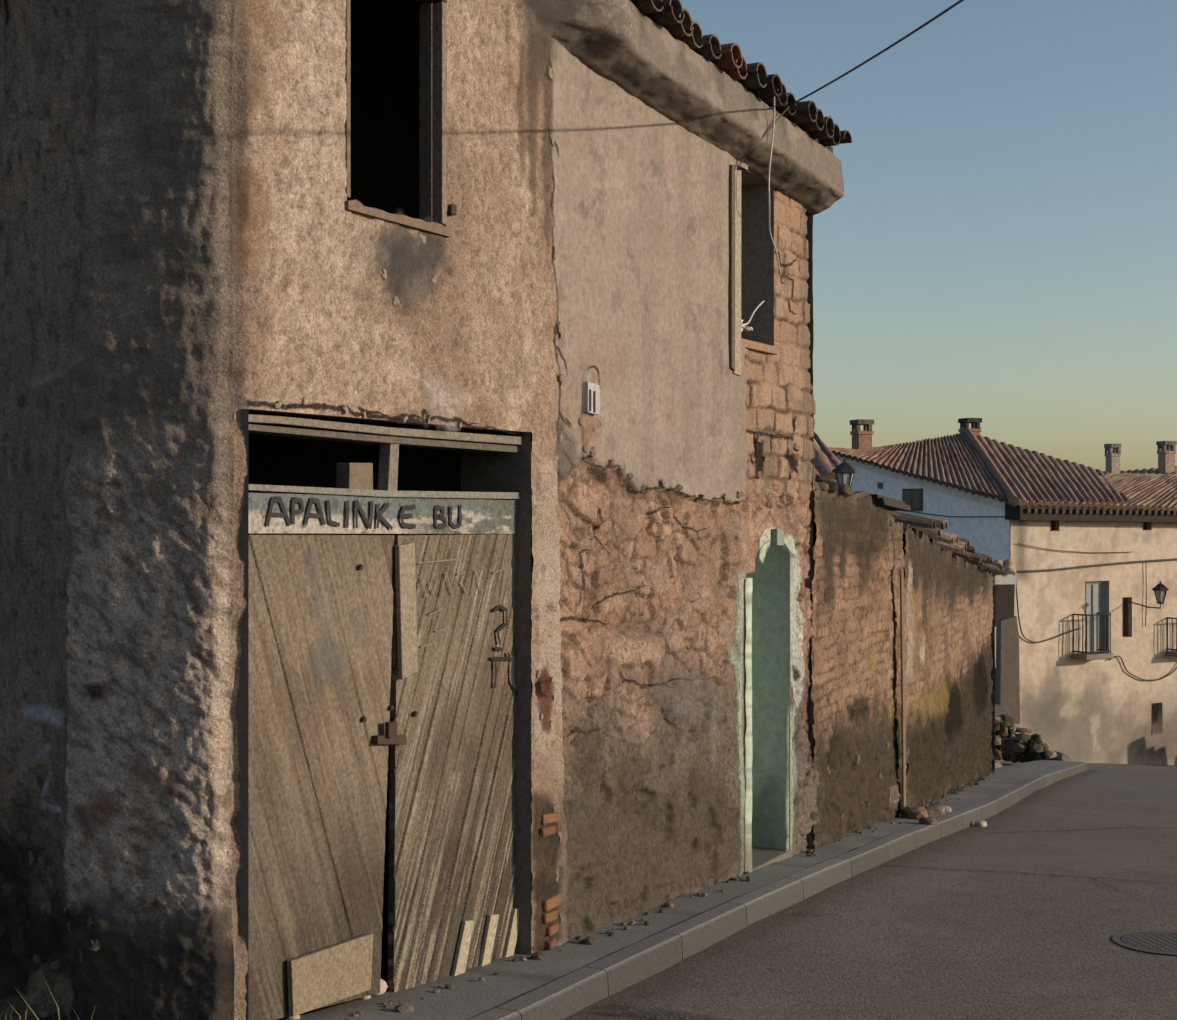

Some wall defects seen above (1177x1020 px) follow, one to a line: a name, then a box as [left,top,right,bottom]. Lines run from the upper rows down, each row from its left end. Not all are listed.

leakage [378,226,447,306]
flaking render [558,414,744,505]
hole [534,669,556,731]
flaking render [602,633,660,668]
peeling [730,573,745,874]
peeling [759,527,805,850]
leakage [906,645,994,800]